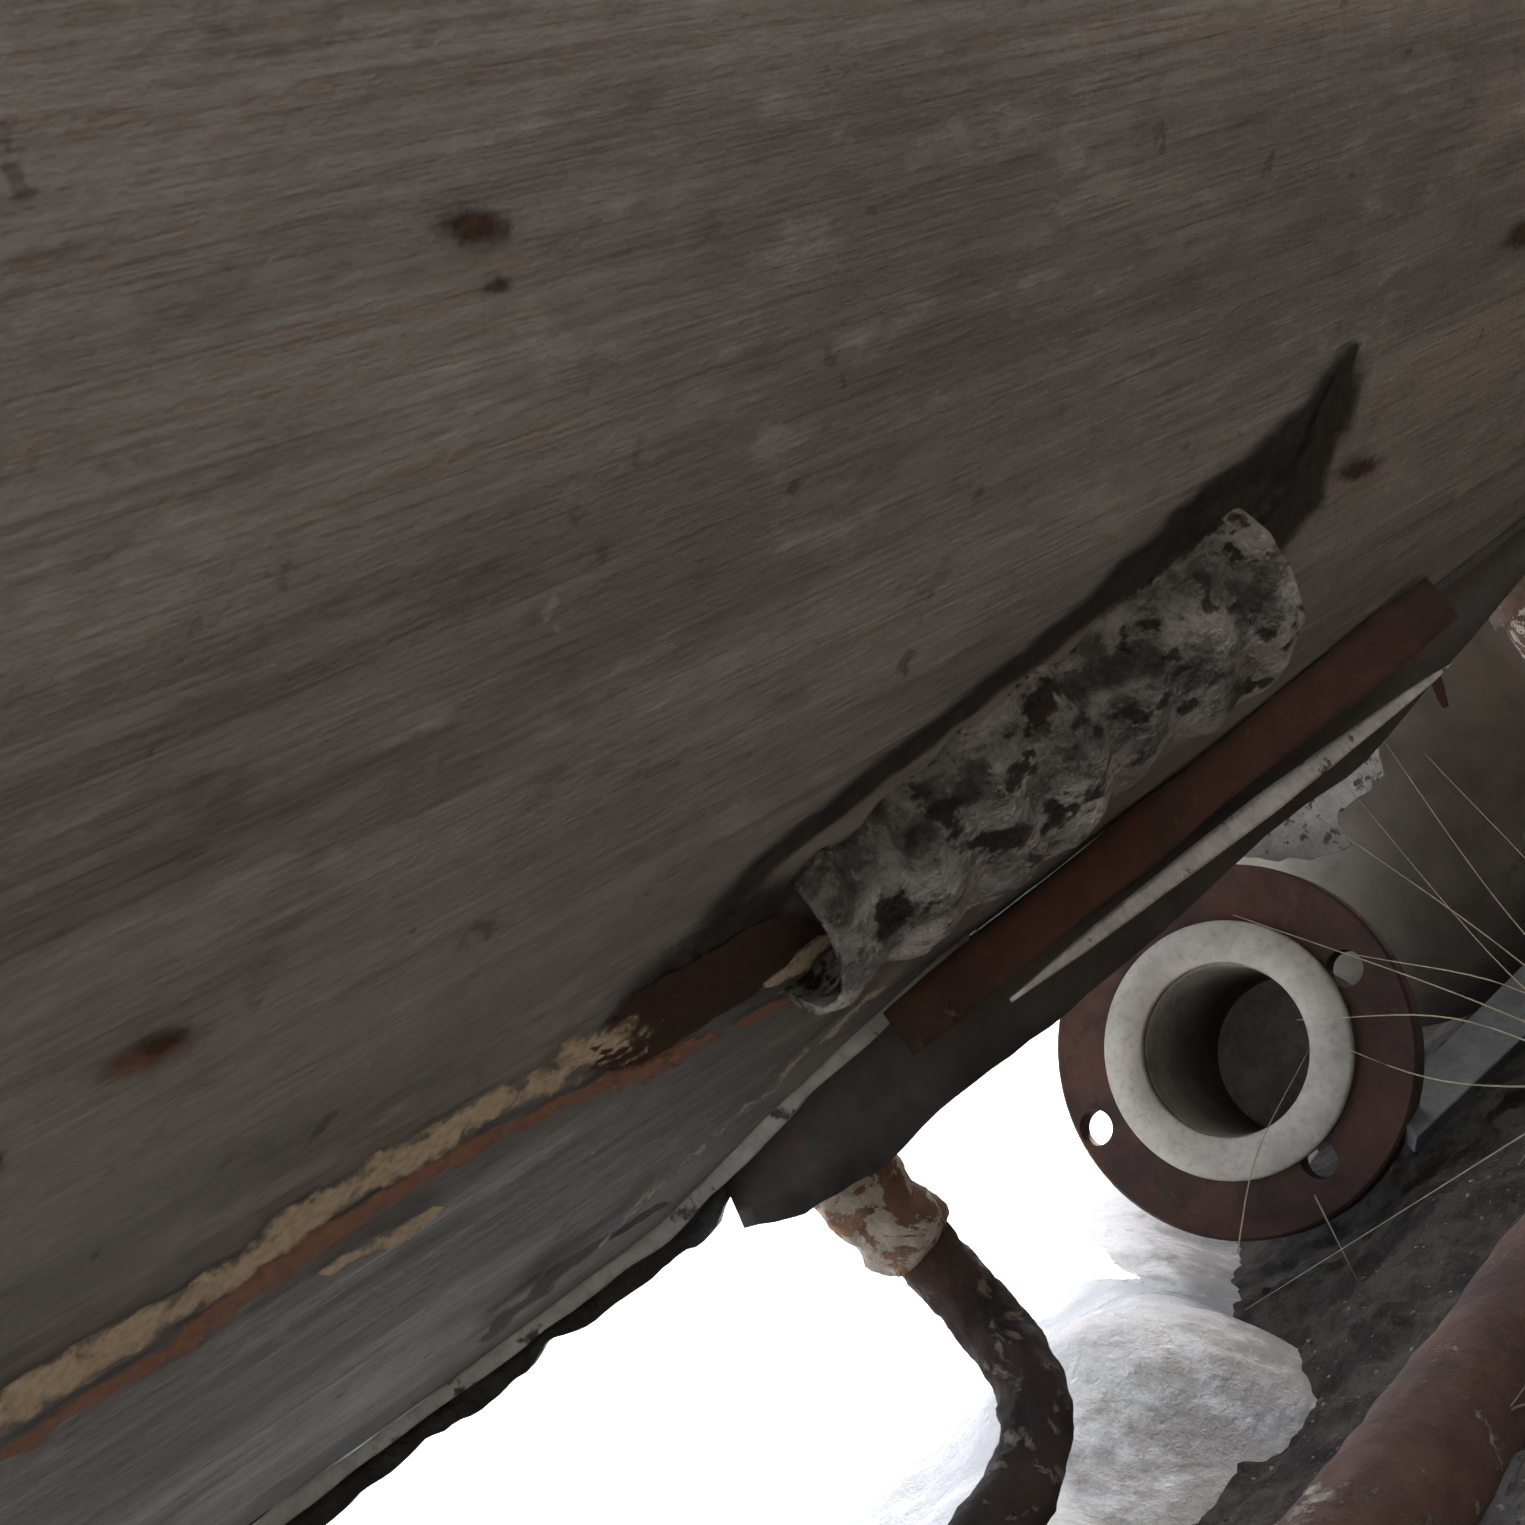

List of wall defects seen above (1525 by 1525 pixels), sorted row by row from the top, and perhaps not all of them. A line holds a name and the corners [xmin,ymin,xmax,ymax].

rust [105,1029,185,1079]
peeling [0,935,830,1462]
peeling [480,980,894,1343]